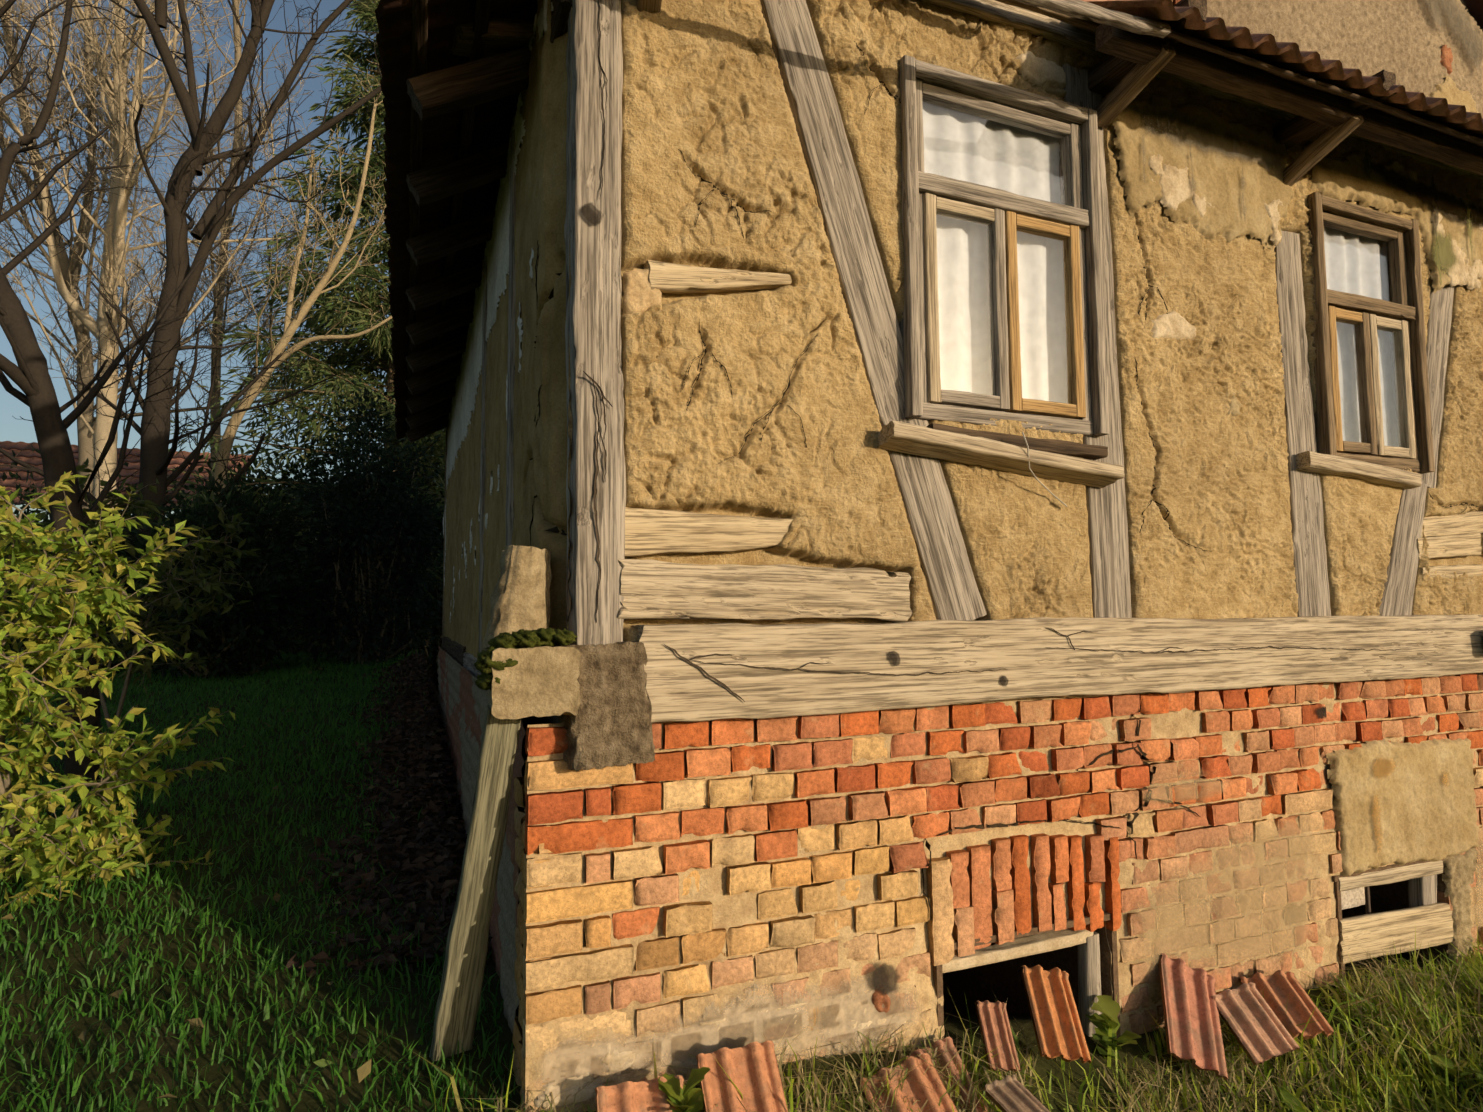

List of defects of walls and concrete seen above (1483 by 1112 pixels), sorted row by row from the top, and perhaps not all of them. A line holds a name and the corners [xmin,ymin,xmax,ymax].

crack [854,41,901,115]
crack [678,149,768,238]
crack [1137,235,1168,320]
peeling [443,93,526,622]
crack [681,320,732,410]
crack [719,340,814,464]
crack [1134,356,1211,552]
crack [664,644,1008,702]